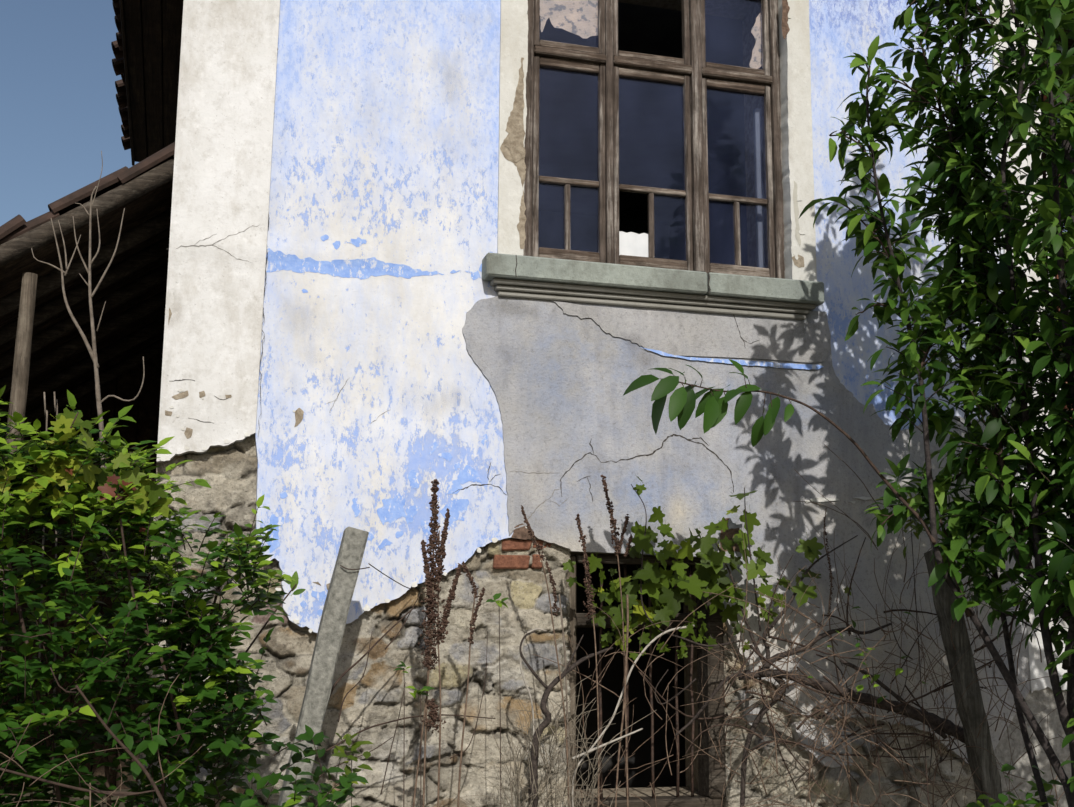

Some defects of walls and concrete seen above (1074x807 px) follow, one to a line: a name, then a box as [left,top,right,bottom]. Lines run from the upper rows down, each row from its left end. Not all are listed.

flaking render [500,57,526,249]
crack [176,213,269,433]
spalling [165,389,205,450]
crack [453,434,734,520]
flaking render [805,496,872,506]
flaking render [491,523,551,569]
spalling [720,517,740,552]
peeling [293,600,323,633]